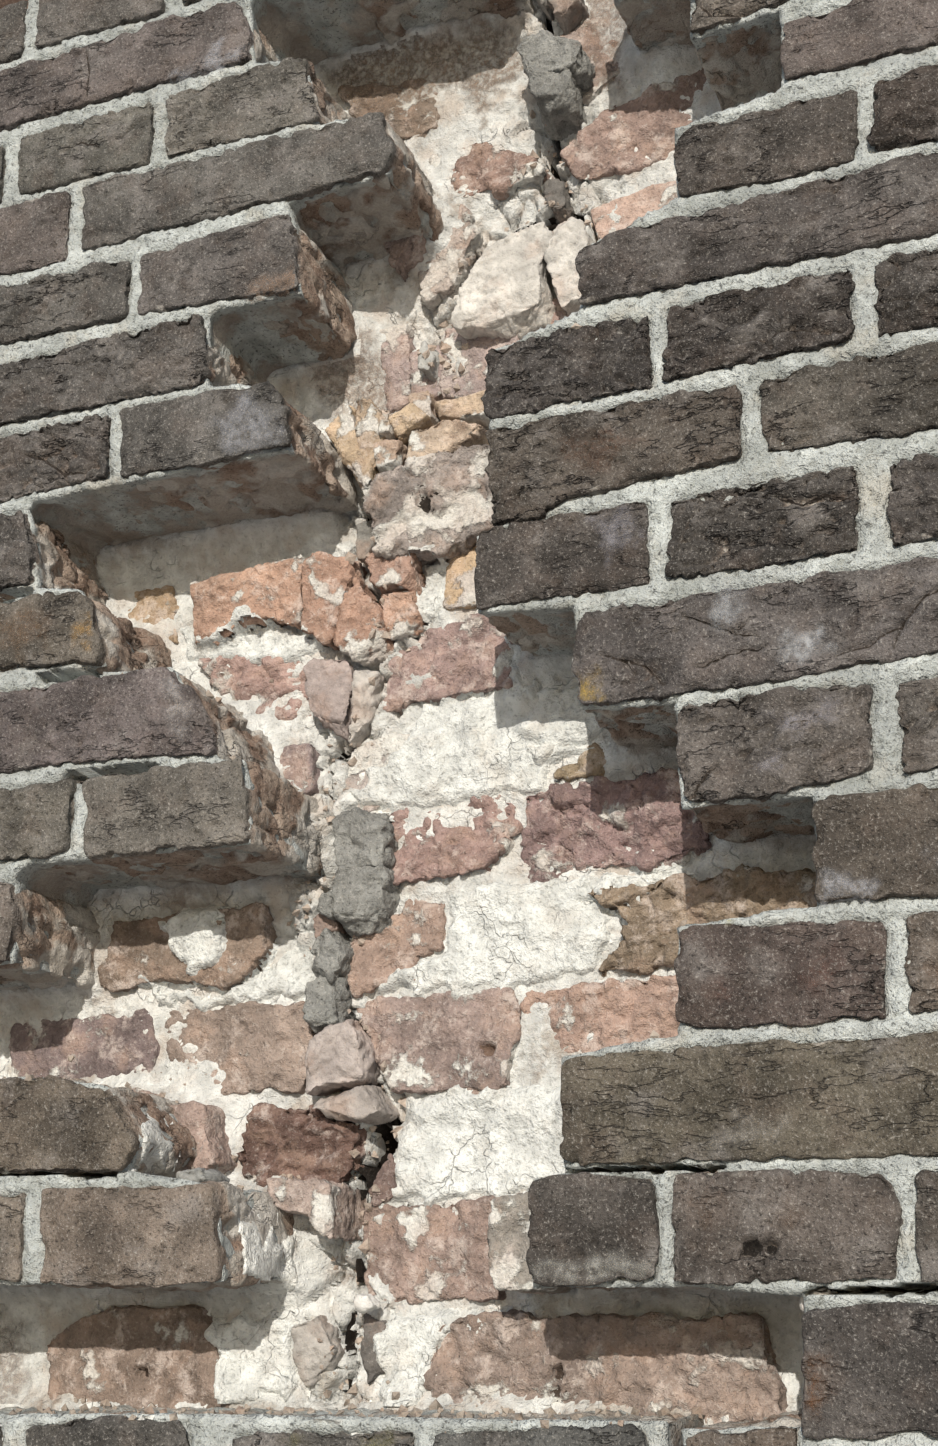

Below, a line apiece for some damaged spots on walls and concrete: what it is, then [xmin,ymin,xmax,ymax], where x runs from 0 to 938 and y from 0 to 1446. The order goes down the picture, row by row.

crack [546,18,554,35]
spalling [338,78,440,139]
crack [551,140,562,181]
spalling [560,17,707,240]
spalling [383,142,554,312]
crack [515,214,585,232]
spalling [379,298,569,413]
crack [190,390,490,682]
spalling [8,444,817,1424]
crack [356,1118,403,1203]
crack [345,1259,367,1390]